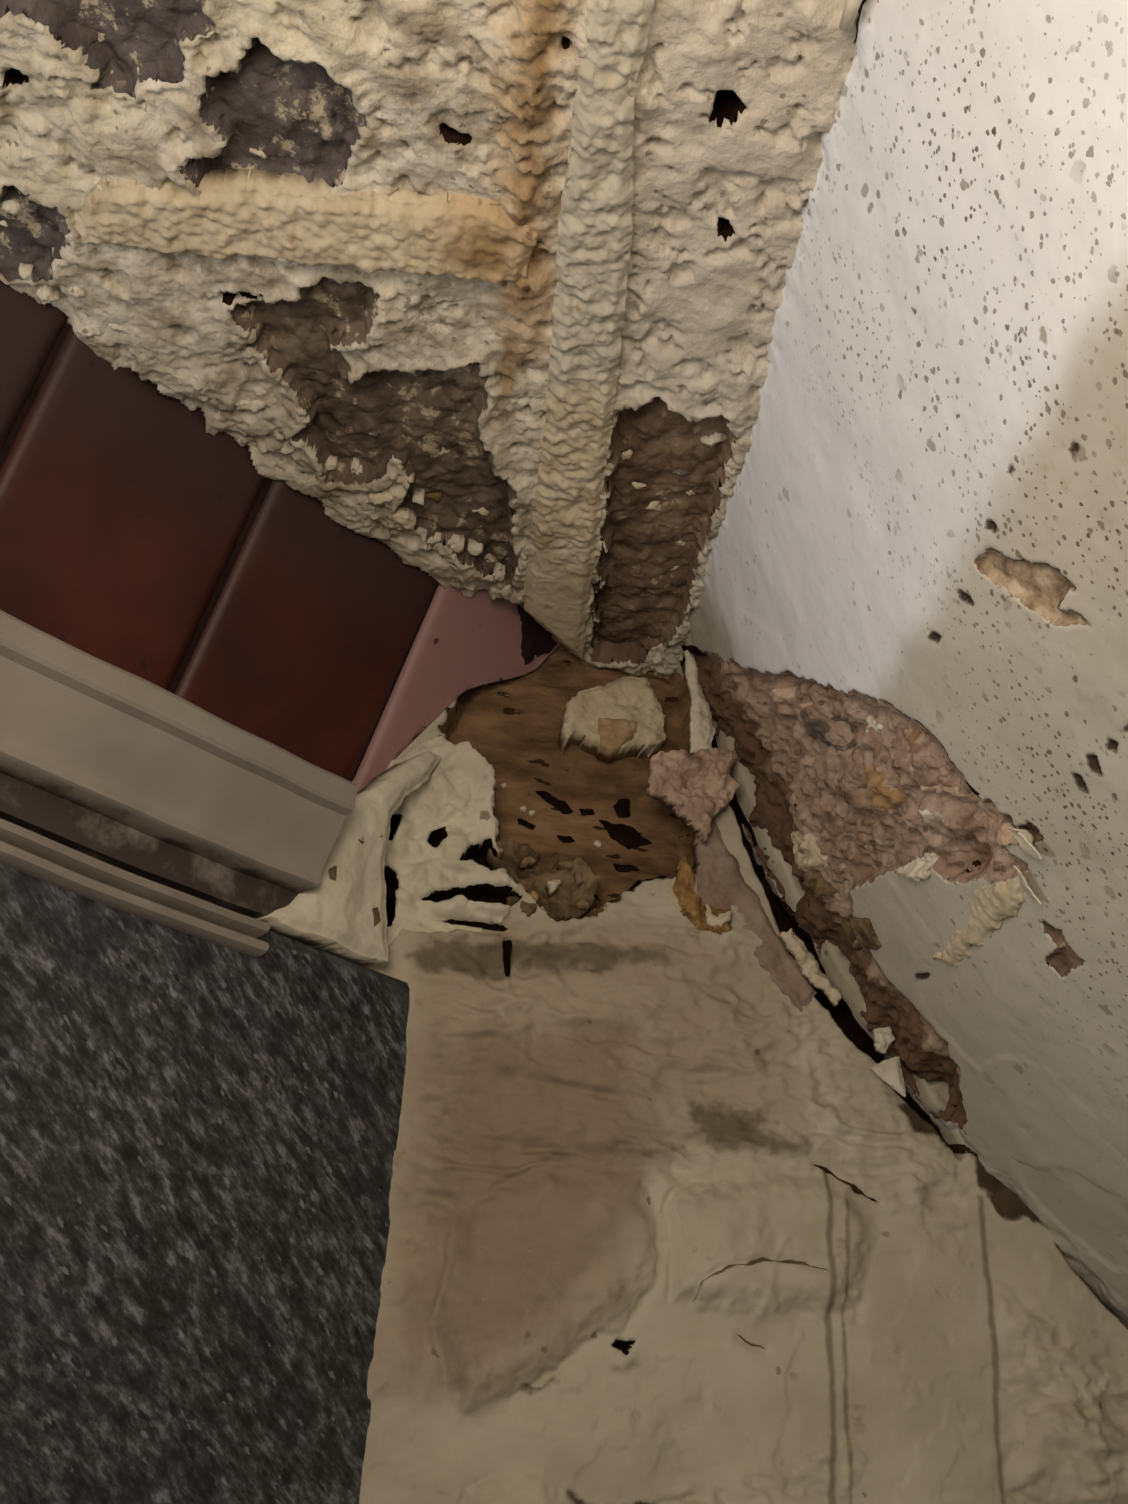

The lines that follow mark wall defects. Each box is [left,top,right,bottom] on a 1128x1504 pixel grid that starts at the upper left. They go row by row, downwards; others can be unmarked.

flaking render [0,0,216,98]
flaking render [179,37,366,193]
rust [451,0,556,309]
flaking render [0,186,84,305]
flaking render [231,277,557,665]
peeling [328,865,337,881]
spalling [358,735,523,945]
flaking render [586,397,1090,1135]
leakage [899,1104,948,1146]
leakage [972,1151,1042,1224]